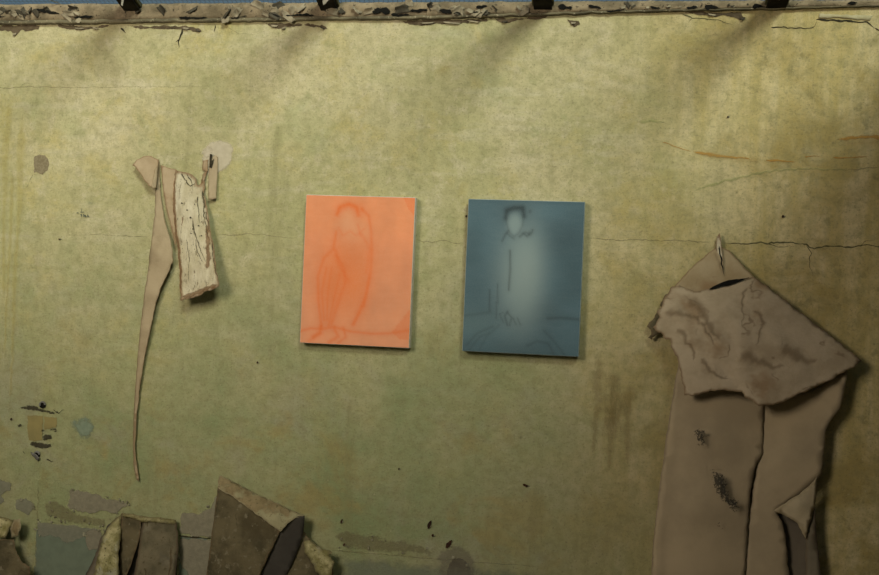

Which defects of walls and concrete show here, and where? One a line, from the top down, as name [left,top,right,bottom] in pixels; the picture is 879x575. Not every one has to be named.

spalling [0,5,109,35]
spalling [220,0,327,29]
spalling [323,0,547,26]
peeling [558,4,580,27]
spalling [589,1,764,20]
crack [771,13,879,31]
spalling [34,155,49,175]
crack [728,240,879,276]
spalling [30,428,56,448]
peeling [178,496,217,575]